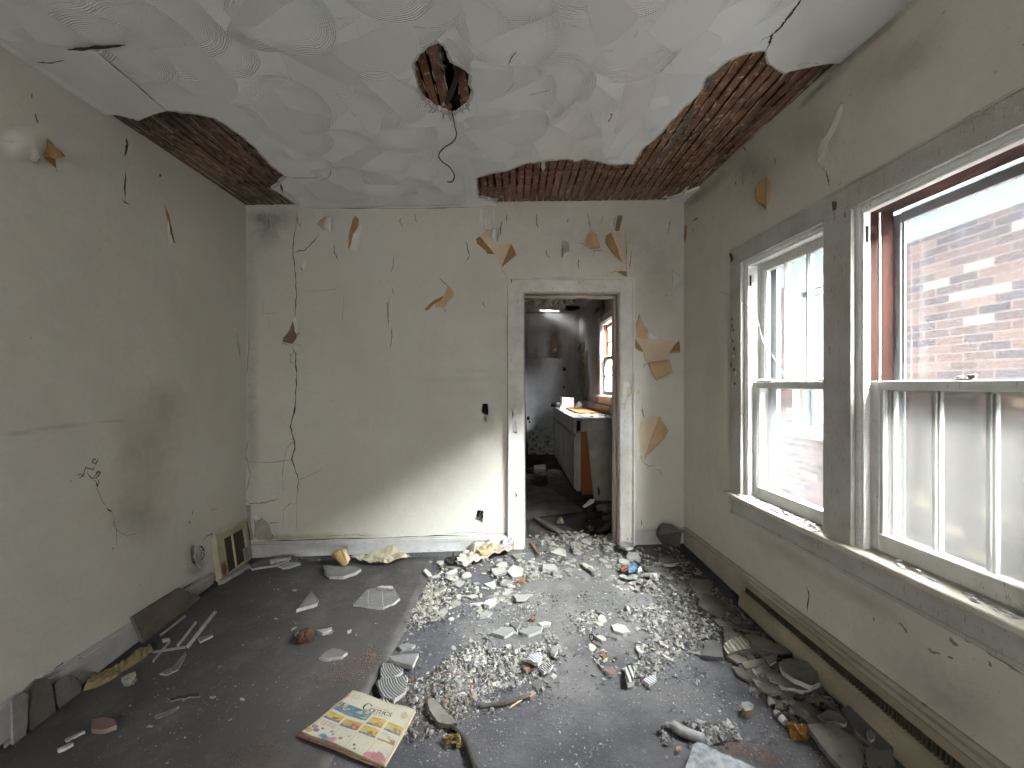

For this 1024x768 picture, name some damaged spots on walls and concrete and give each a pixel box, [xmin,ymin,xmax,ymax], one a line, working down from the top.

crack [766,0,801,50]
crack [38,45,166,110]
spalling [412,40,474,116]
peeling [4,139,65,172]
crack [292,213,319,317]
peeling [348,215,361,253]
peeling [425,279,454,312]
peeling [476,227,516,267]
peeling [562,214,627,276]
peeling [635,314,680,380]
crack [246,344,506,542]
peeling [638,407,669,468]